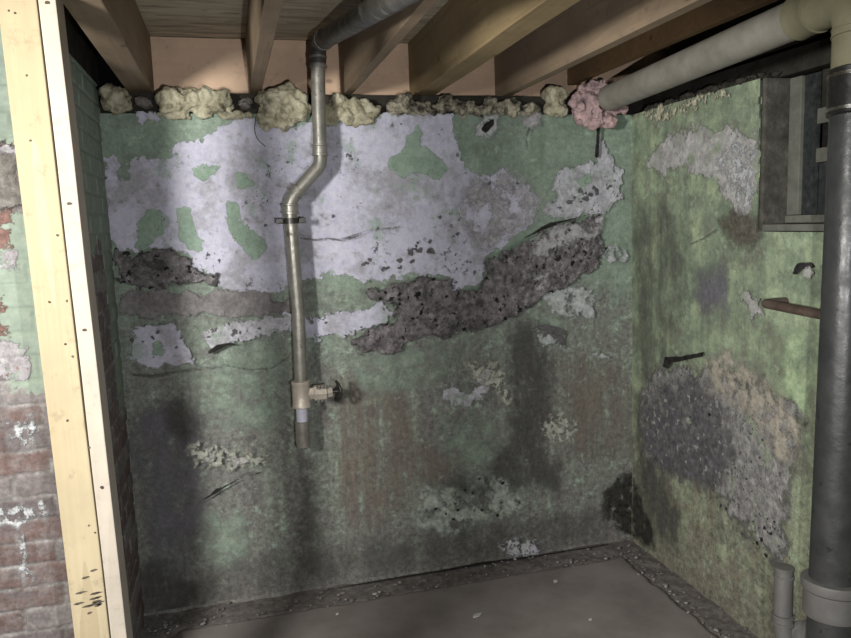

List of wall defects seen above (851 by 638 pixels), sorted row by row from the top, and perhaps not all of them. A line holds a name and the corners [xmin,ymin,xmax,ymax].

peeling [134,111,160,126]
peeling [647,122,761,217]
peeling [0,208,19,270]
peeling [103,117,314,370]
peeling [297,112,629,356]
crack [527,211,599,237]
peeling [0,324,31,382]
crack [200,472,261,502]
damp [413,325,578,536]
damp [603,395,679,550]
spalling [639,350,808,564]